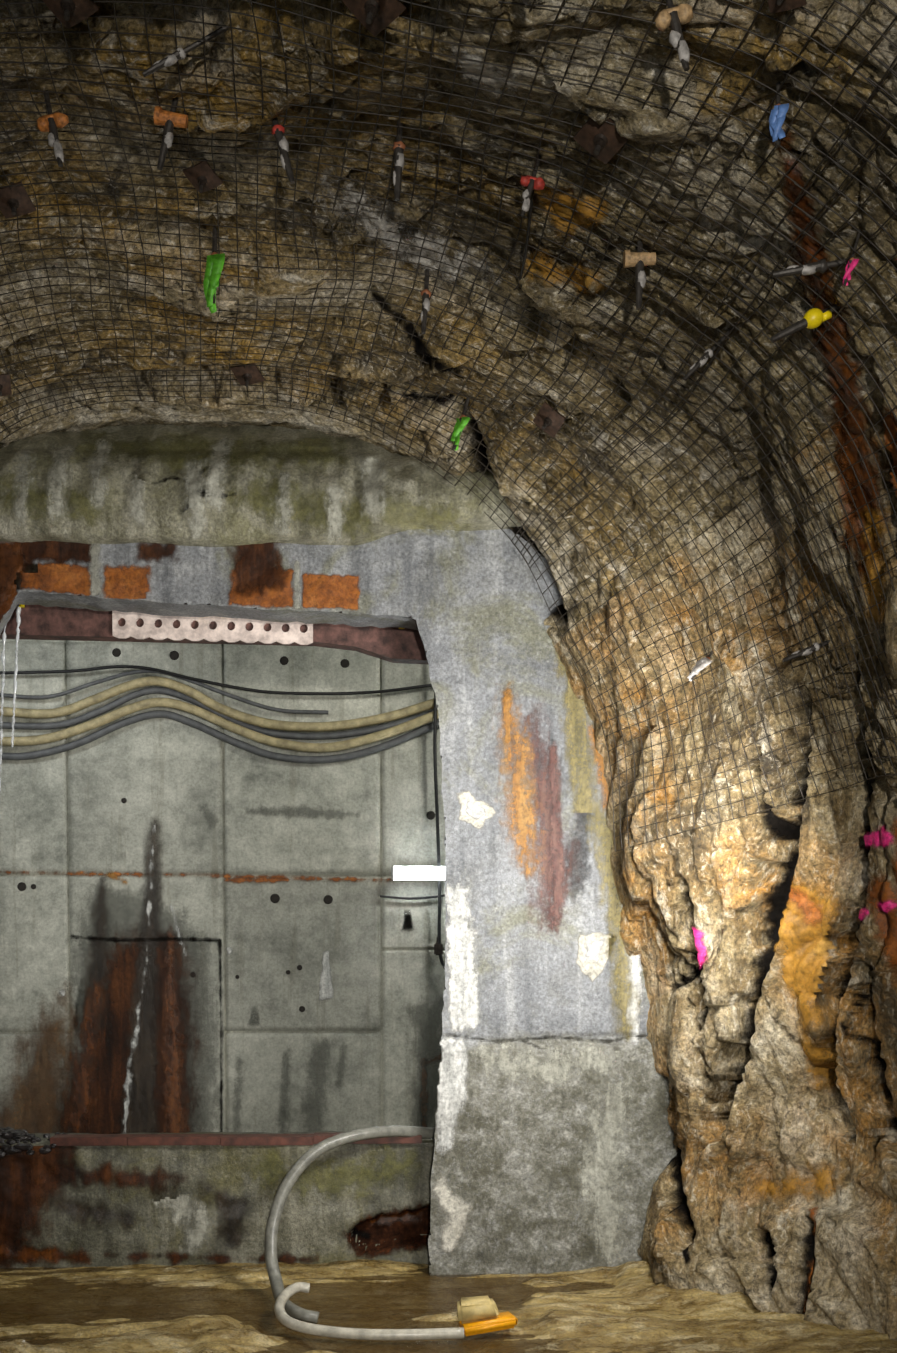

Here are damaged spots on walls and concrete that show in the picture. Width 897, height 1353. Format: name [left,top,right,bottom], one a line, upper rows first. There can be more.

rust [780,135,897,623]
damp [48,446,72,517]
damp [90,440,111,507]
damp [187,436,230,538]
damp [278,473,291,531]
damp [328,487,343,539]
damp [364,457,385,516]
rust [0,541,177,622]
rust [229,542,360,610]
rust [206,874,415,883]
rust [501,656,632,1038]
rust [0,1146,188,1268]